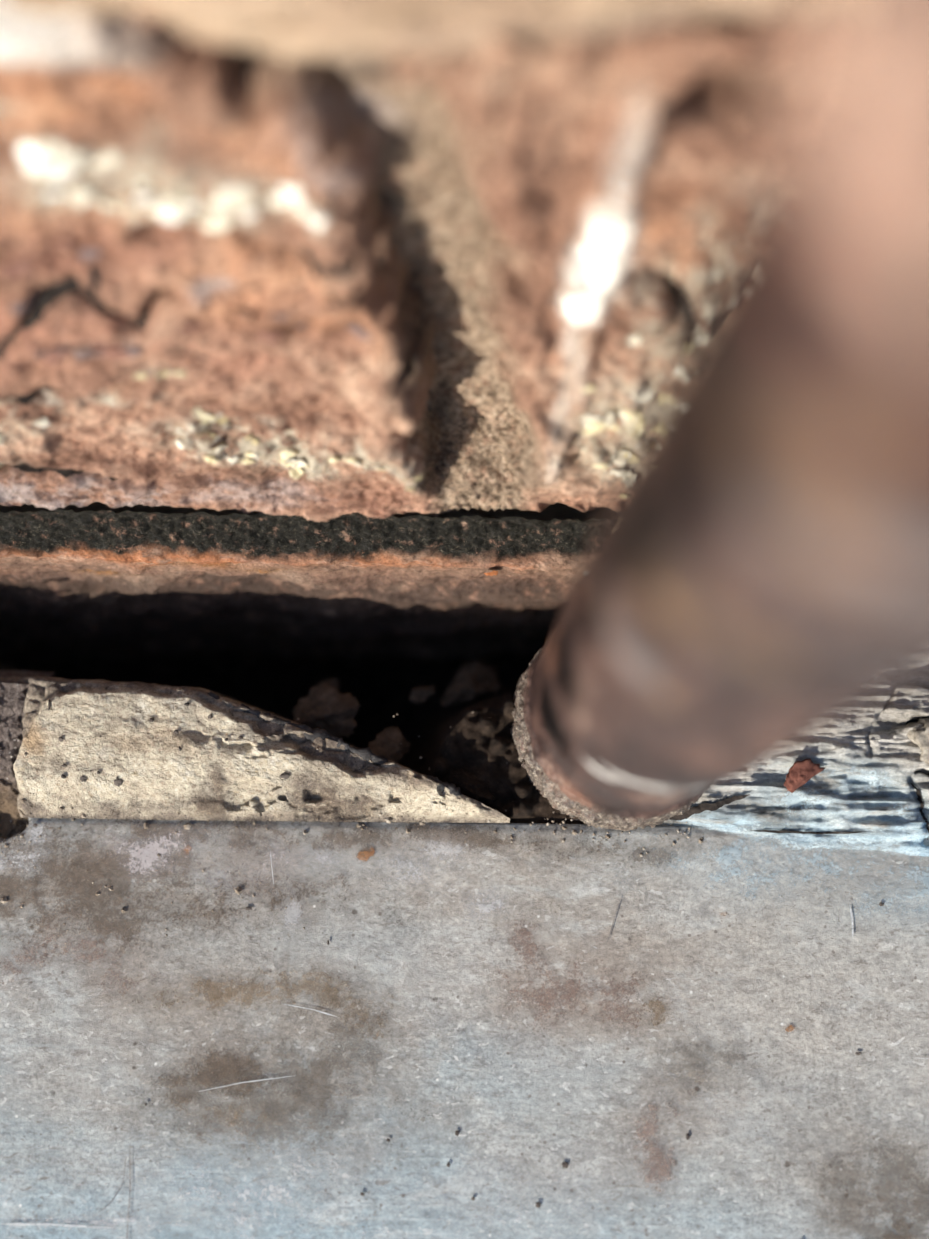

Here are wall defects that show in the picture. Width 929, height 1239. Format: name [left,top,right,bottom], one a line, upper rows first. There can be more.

spalling [0,670,55,839]
water stain [0,826,50,871]
efflorescence [105,833,193,876]
water stain [210,871,349,926]
water stain [159,1053,273,1109]